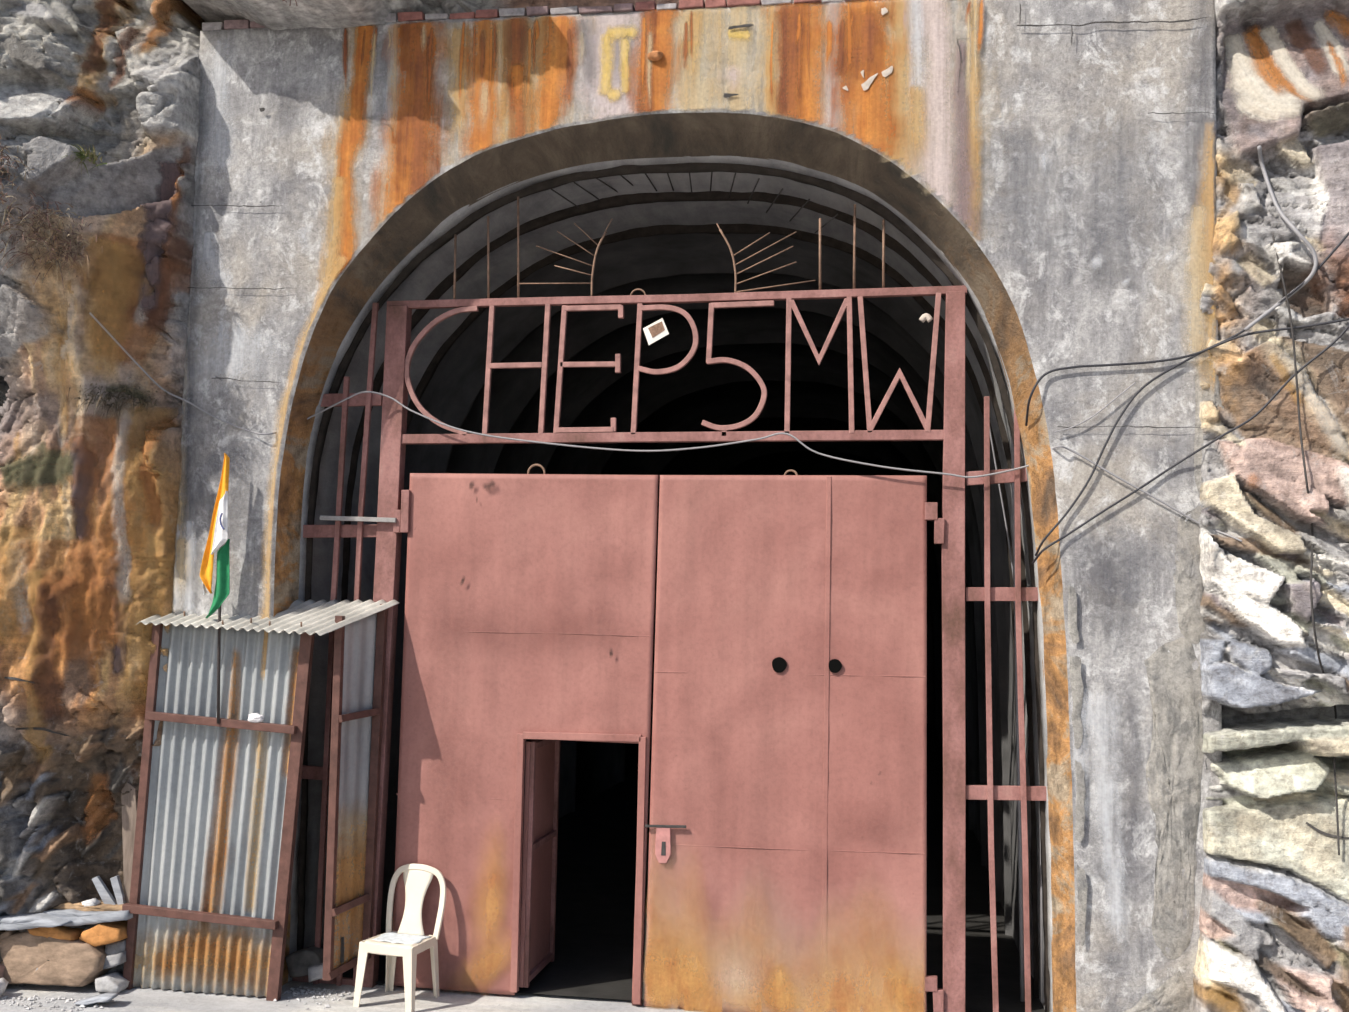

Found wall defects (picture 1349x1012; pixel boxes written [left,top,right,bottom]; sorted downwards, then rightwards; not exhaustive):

corrosion [601,10,700,112]
corrosion [765,0,913,168]
peeling [843,66,893,91]
corrosion [954,0,983,232]
corrosion [1190,131,1215,382]
corrosion [262,15,584,677]
corrosion [204,653,237,912]
corrosion [134,931,271,976]
corrosion [333,821,367,969]
corrosion [470,867,504,982]
corrosion [646,939,924,1012]